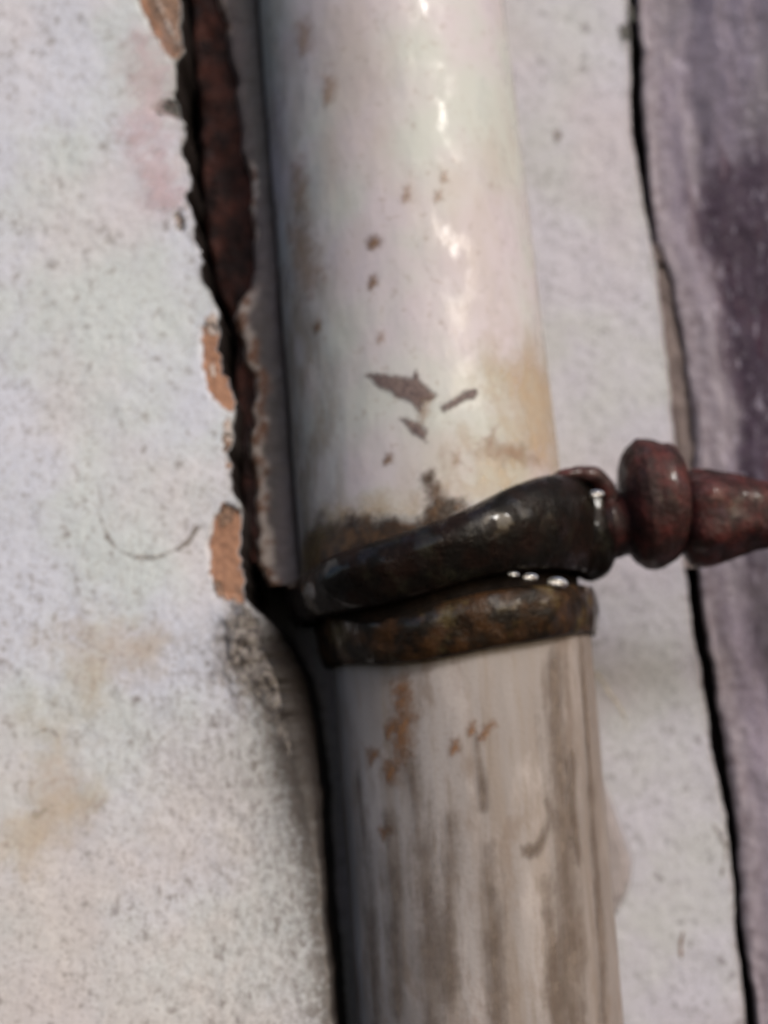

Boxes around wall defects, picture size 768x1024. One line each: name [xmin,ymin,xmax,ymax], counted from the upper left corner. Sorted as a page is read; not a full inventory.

crack [628,0,643,201]
peeling [173,213,185,232]
flaking render [200,312,235,469]
crack [651,243,695,470]
crack [683,556,729,876]